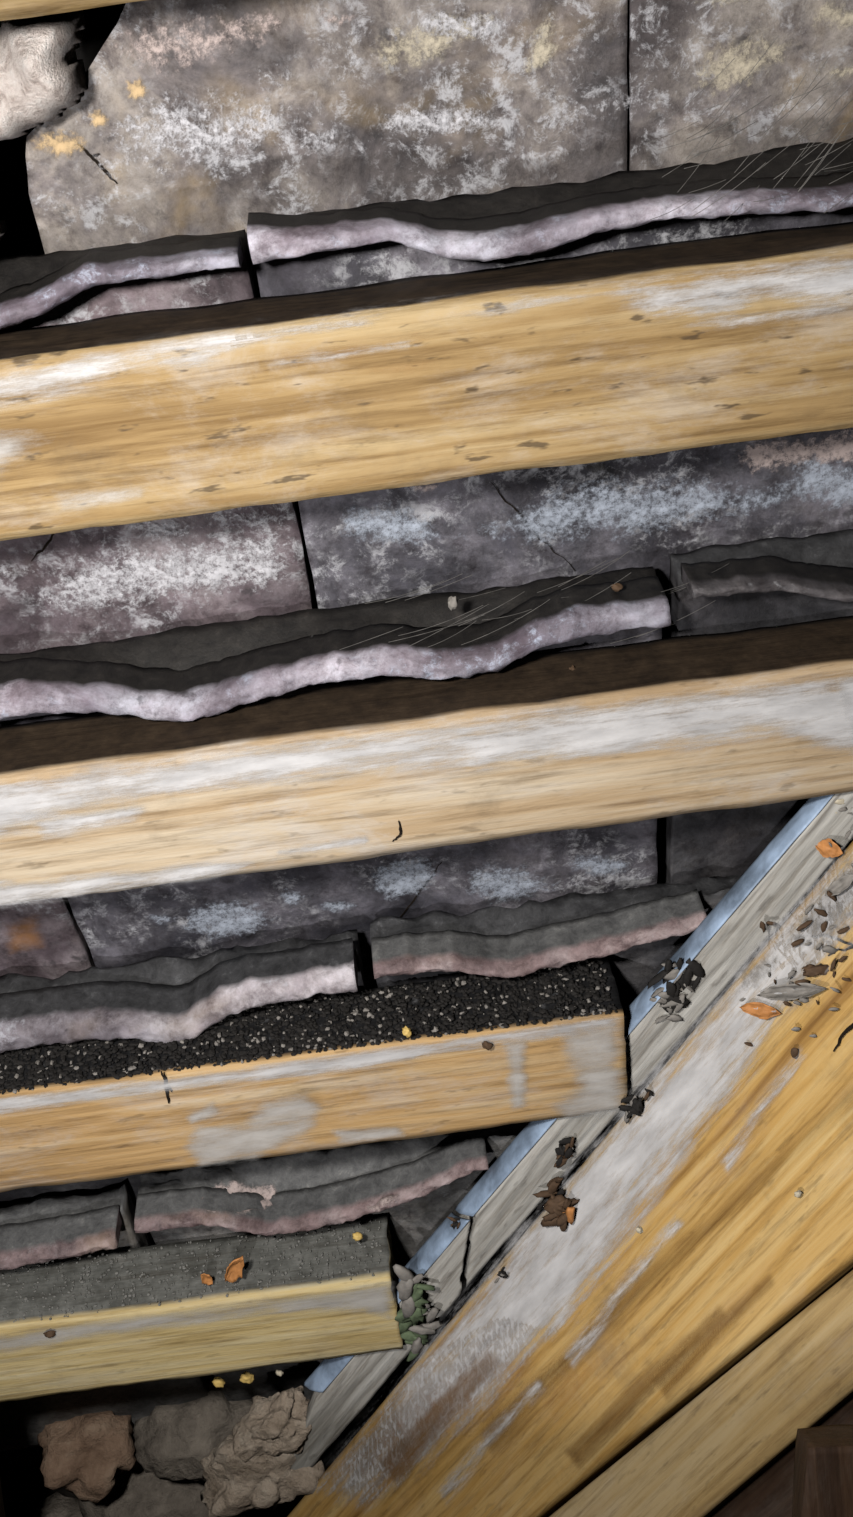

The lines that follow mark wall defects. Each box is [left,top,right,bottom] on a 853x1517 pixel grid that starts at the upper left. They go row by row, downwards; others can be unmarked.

water stain [137,16,277,66]
water stain [381,13,500,65]
water stain [526,25,557,70]
water stain [697,40,783,89]
water stain [36,81,278,161]
water stain [385,106,488,133]
water stain [492,435,853,542]
water stain [344,508,433,541]
water stain [49,514,284,610]
water stain [0,681,853,833]
water stain [572,856,624,874]
water stain [0,861,853,1503]